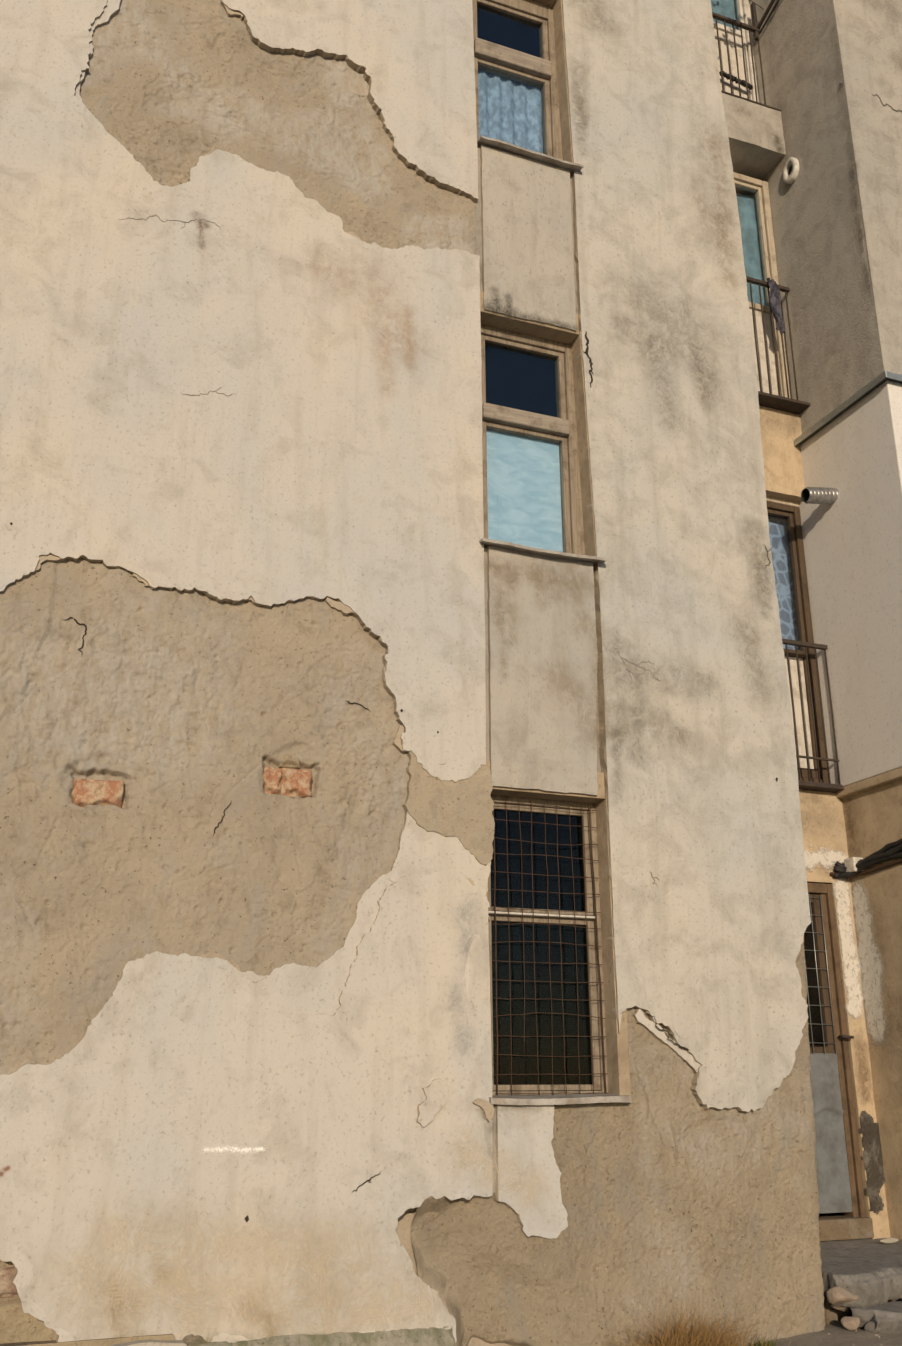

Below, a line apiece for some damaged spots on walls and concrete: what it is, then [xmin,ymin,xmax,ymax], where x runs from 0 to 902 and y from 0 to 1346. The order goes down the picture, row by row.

spalling [75,0,476,255]
crack [584,332,594,388]
spalling [0,555,495,1075]
leakage [851,882,886,1042]
spalling [410,935,826,1346]
spalling [0,1260,58,1344]